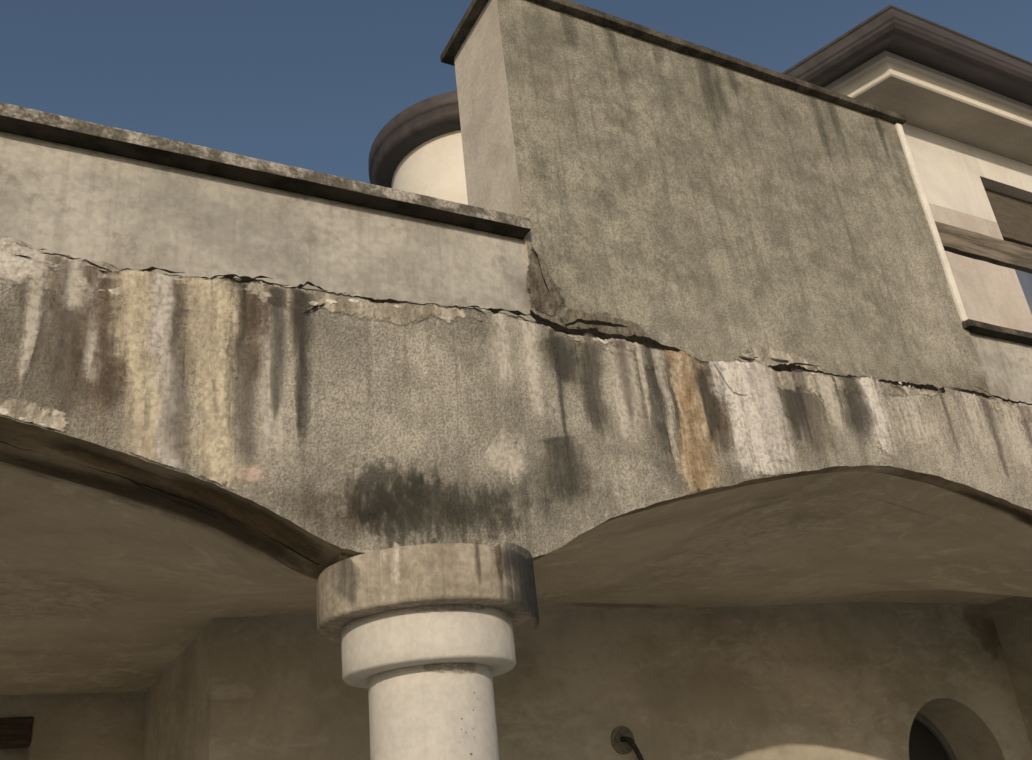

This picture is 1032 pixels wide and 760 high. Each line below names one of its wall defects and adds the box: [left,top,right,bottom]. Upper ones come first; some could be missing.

leakage [0,238,310,489]
leakage [495,314,511,384]
crack [11,241,1032,405]
leakage [522,321,603,494]
spalling [526,245,674,370]
leakage [614,340,682,460]
corrosion [664,350,721,492]
leakage [696,360,934,476]
spalling [736,346,914,399]
leakage [961,392,1032,471]
crack [0,441,319,565]
leakage [350,465,539,626]